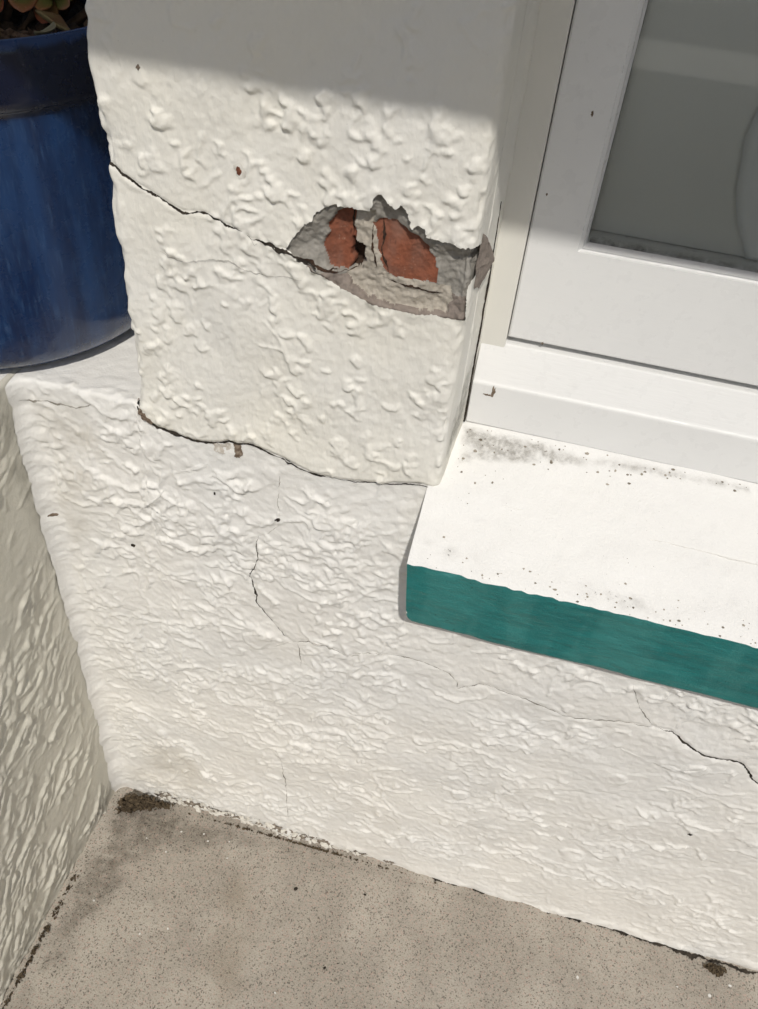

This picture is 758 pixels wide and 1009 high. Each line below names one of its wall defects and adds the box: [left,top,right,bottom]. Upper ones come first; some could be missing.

crack [110,161,316,281]
spalling [286,195,495,321]
crack [137,398,758,784]